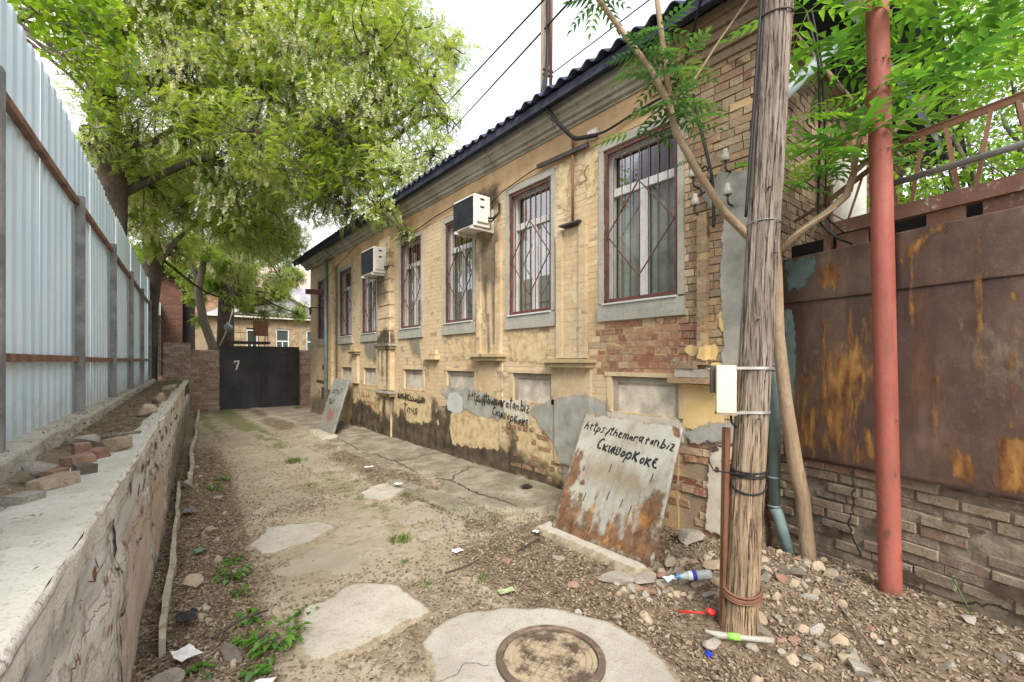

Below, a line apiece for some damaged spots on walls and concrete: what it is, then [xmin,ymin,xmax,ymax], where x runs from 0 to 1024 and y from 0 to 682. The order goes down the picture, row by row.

corrosion [900,225,945,263]
flaking render [589,44,757,539]
crack [44,409,178,682]
crack [336,437,513,505]
leakage [350,395,565,490]
peeling [393,390,563,484]
corrosion [799,337,874,459]
crack [847,471,862,557]
corrosion [994,439,1024,492]